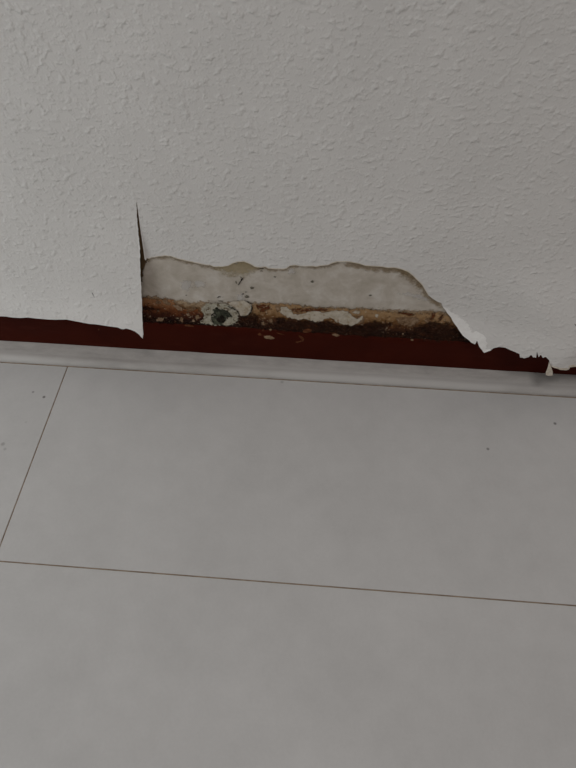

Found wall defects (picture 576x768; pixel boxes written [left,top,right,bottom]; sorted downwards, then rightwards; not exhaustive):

peeling [141,256,451,343]
damp [147,256,470,343]